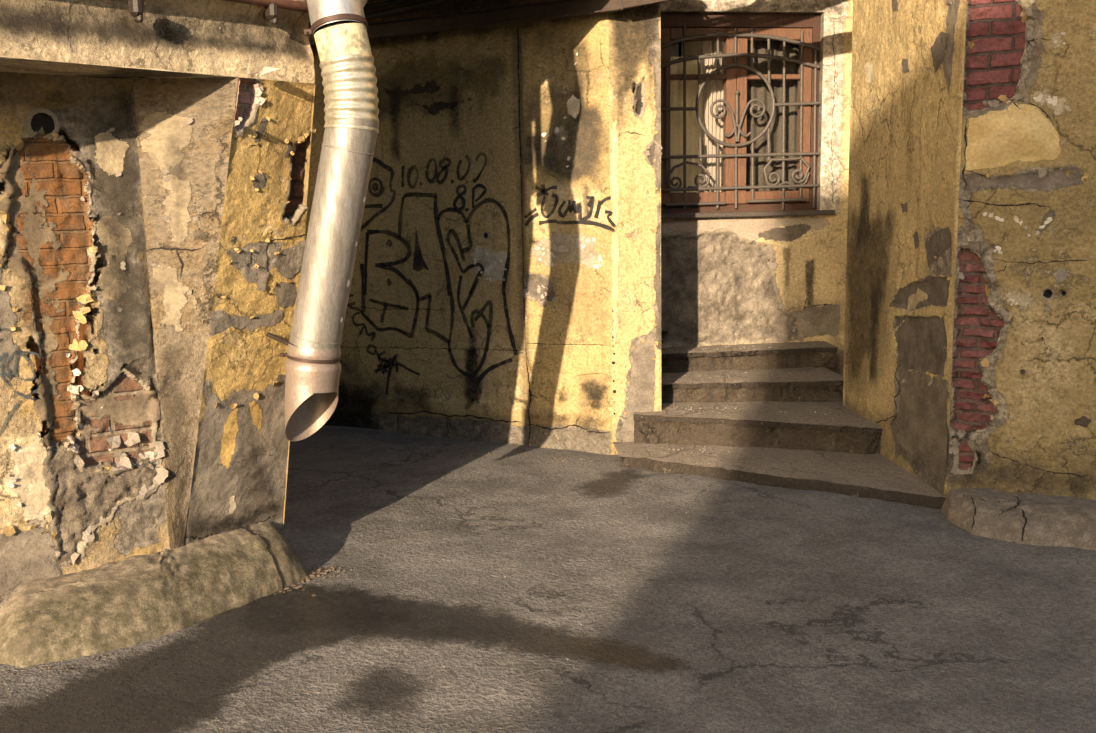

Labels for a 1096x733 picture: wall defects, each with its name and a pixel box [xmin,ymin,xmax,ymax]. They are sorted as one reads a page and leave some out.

flaking render [233,67,279,146]
flaking render [928,0,1072,119]
peeling [201,236,306,334]
flaking render [281,129,316,225]
crack [958,109,1050,211]
peeling [983,210,1055,237]
crack [995,259,1091,273]
flaking render [0,128,168,600]
flaking render [620,227,840,442]
flaking render [889,226,1037,485]
crack [988,449,1089,476]
crack [963,495,1027,541]